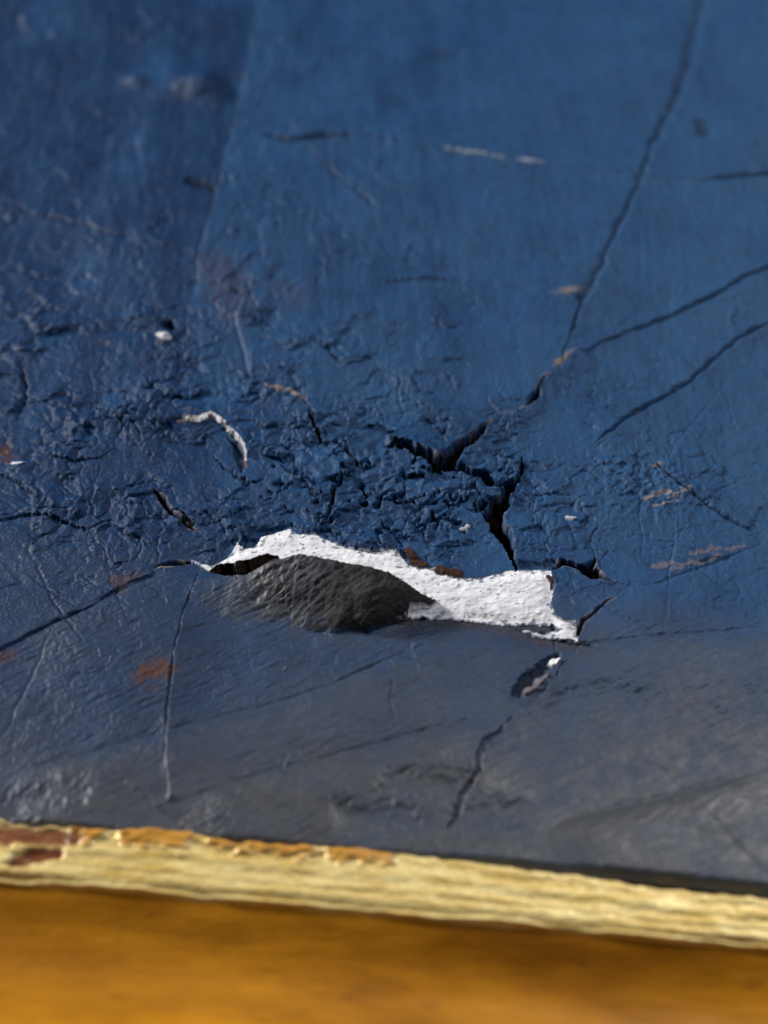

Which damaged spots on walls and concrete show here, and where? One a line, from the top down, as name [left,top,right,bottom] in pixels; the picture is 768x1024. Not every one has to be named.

crack [260,0,768,572]
crack [0,559,201,808]
peeling [191,529,579,643]
crack [445,554,619,832]